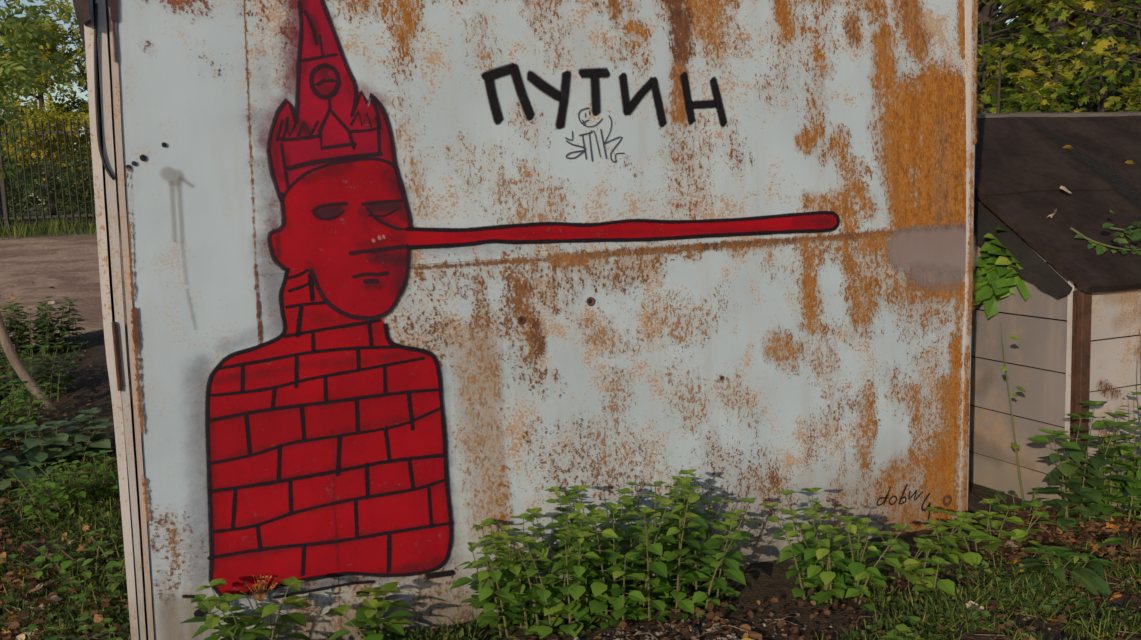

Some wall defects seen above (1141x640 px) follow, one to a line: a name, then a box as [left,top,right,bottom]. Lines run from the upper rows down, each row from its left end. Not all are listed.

rust [125,168,145,434]
rust [141,0,215,20]
rust [237,0,300,344]
rust [326,0,502,222]
rust [383,0,978,549]
rust [136,475,208,605]